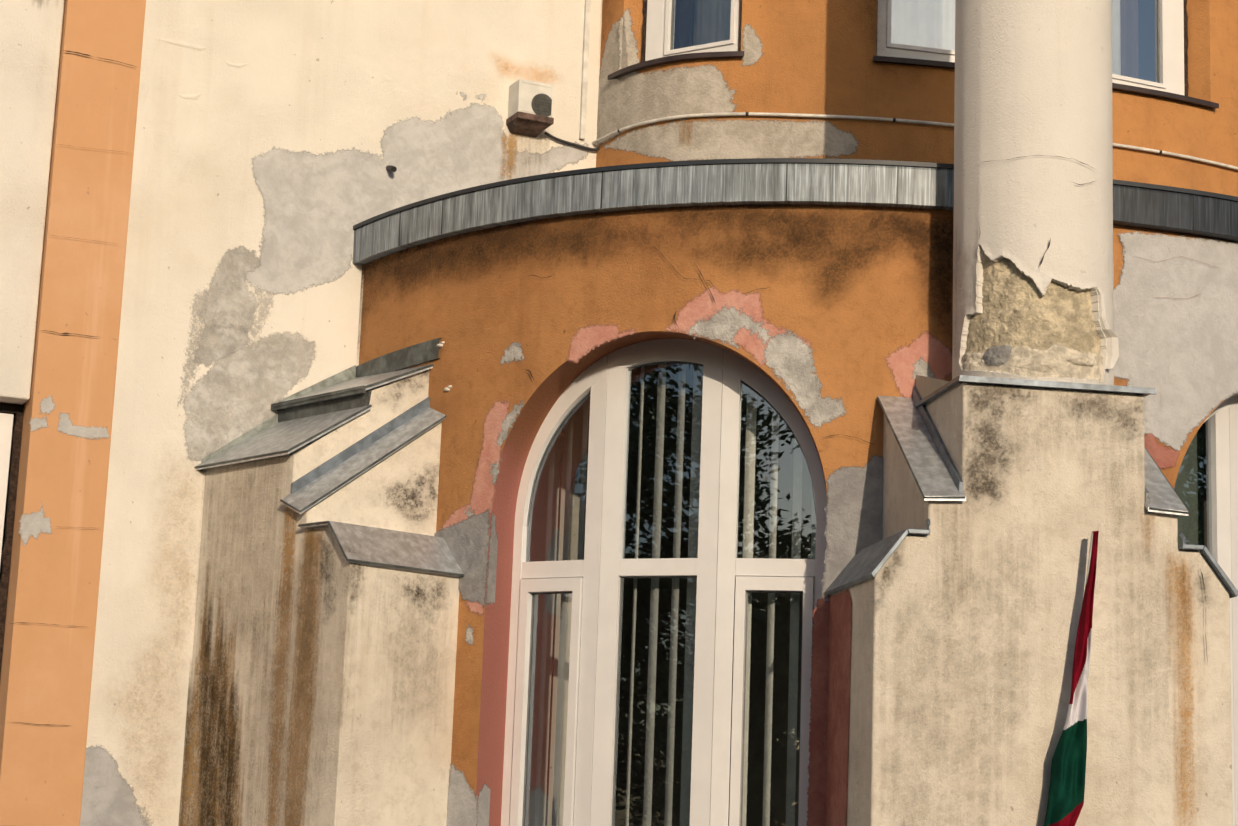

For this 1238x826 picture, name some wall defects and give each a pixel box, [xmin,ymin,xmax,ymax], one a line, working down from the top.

peeling [665,285,812,366]
flaking render [885,245,1119,398]
peeling [29,395,109,440]
peeling [439,400,524,530]
peeling [1144,433,1179,469]
peeling [18,501,52,546]
peeling [465,601,484,645]
water stain [179,583,241,826]